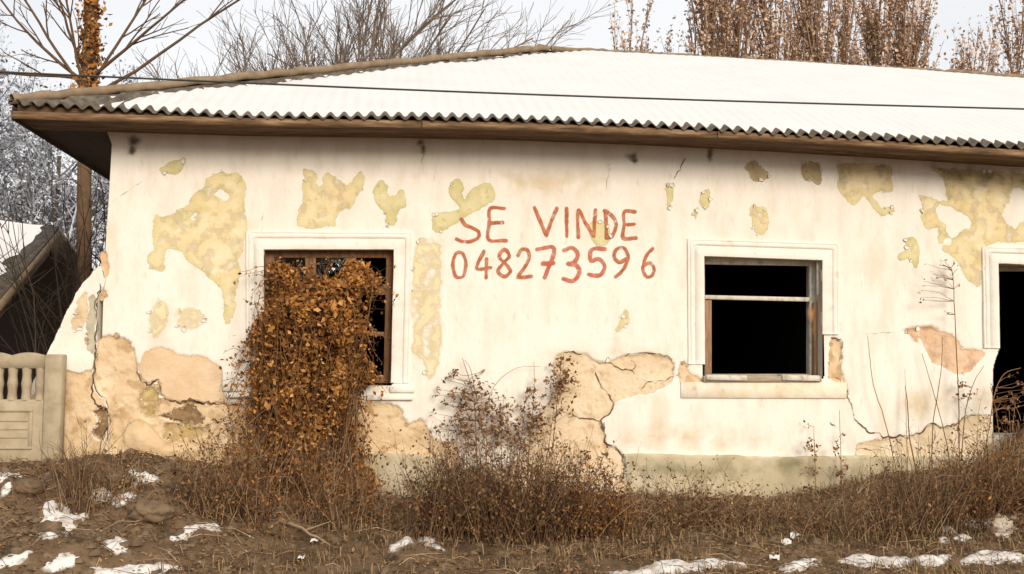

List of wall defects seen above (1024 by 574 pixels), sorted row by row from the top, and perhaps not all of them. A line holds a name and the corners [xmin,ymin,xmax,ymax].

peeling [147,170,247,324]
peeling [297,168,406,229]
peeling [410,179,495,379]
peeling [836,163,895,216]
peeling [920,168,1024,287]
crack [91,285,111,429]
spalling [63,251,274,469]
spalling [452,352,702,496]
crack [565,351,674,492]
crack [830,337,976,456]
spalling [855,415,994,457]
spalling [905,325,985,375]